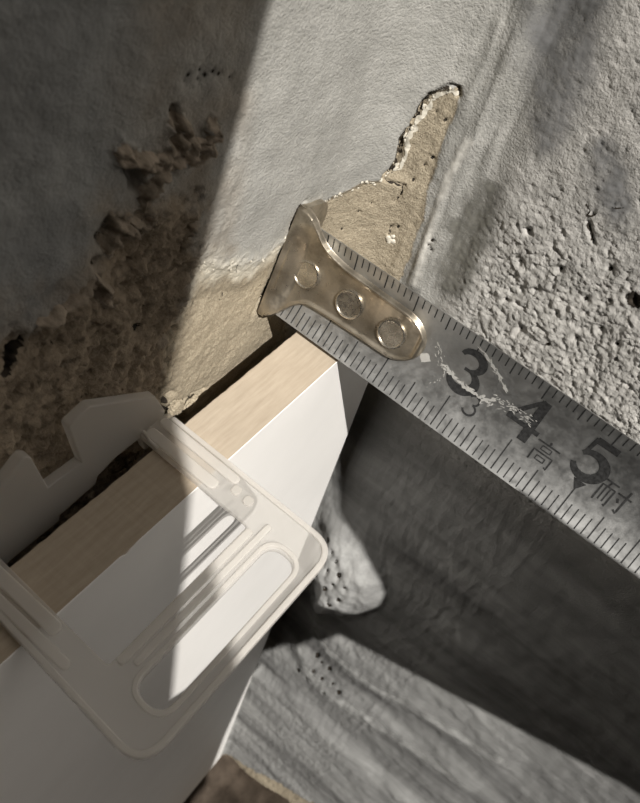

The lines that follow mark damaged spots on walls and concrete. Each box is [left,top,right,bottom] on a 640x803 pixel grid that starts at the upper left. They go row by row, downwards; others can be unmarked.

spalling [321,86,461,281]
peeling [33,258,115,332]
spalling [164,251,284,420]